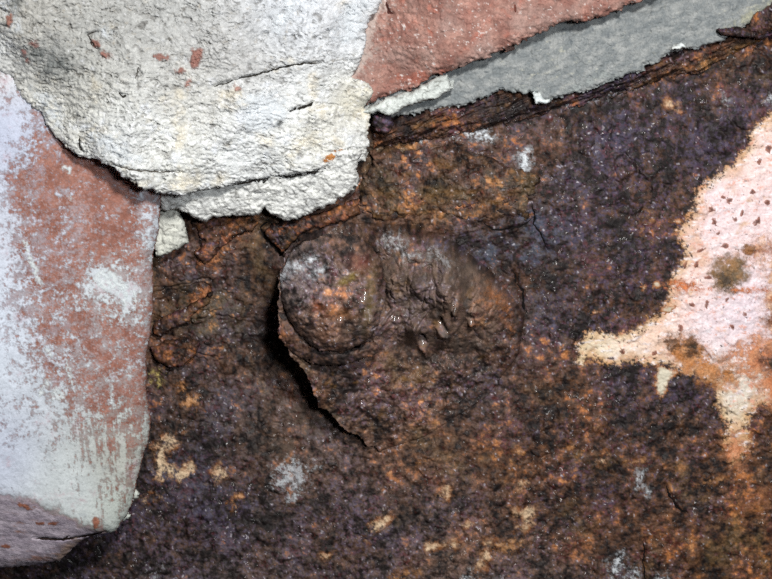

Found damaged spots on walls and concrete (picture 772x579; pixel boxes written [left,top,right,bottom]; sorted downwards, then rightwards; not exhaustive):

spalling [175,48,203,87]
crack [214,62,321,87]
crack [260,222,285,257]
rust [191,198,361,267]
peeling [0,71,160,533]
rust [153,286,214,337]
peeling [575,112,772,468]
rust [664,236,772,408]